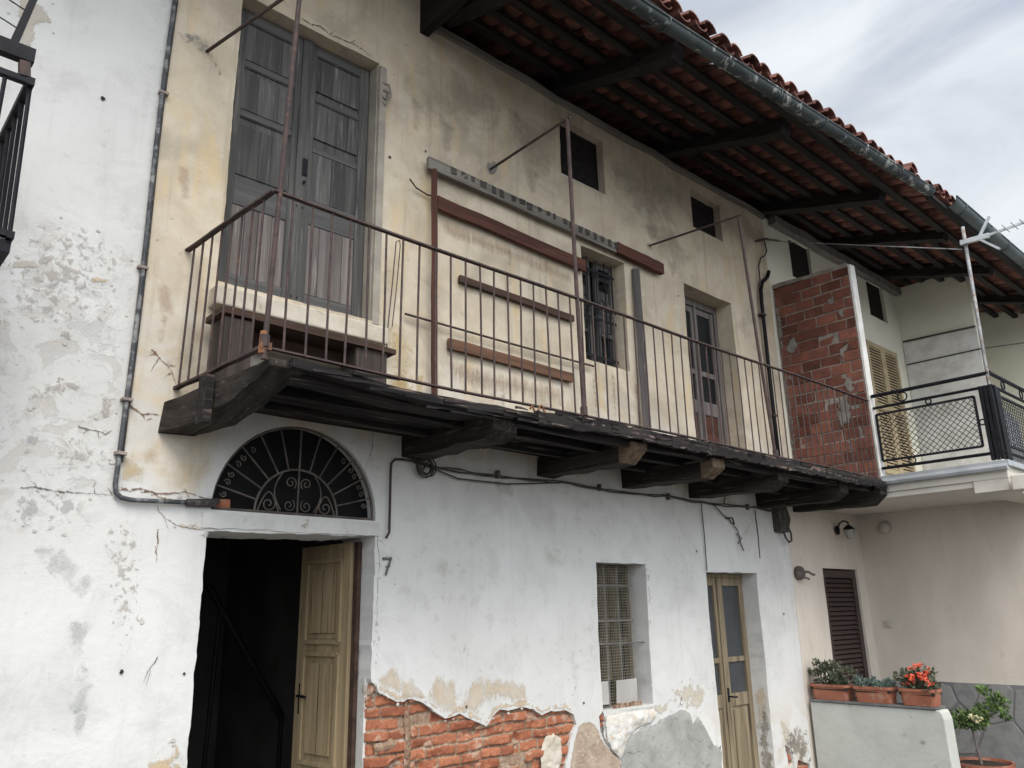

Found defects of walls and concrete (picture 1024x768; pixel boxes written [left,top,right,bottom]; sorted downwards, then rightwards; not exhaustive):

peeling [4,216,117,345]
peeling [28,377,81,411]
crack [148,349,176,383]
crack [20,481,212,561]
flaking render [363,680,621,768]